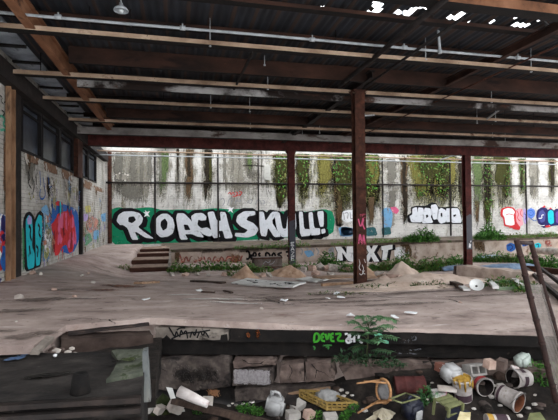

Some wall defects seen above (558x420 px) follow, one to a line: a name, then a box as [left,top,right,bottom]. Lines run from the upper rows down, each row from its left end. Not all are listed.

damp [112,149,269,208]
damp [295,154,311,194]
damp [334,154,352,227]
damp [366,155,411,227]
damp [416,155,462,218]
damp [471,157,510,224]
damp [521,161,540,202]
damp [545,159,558,202]